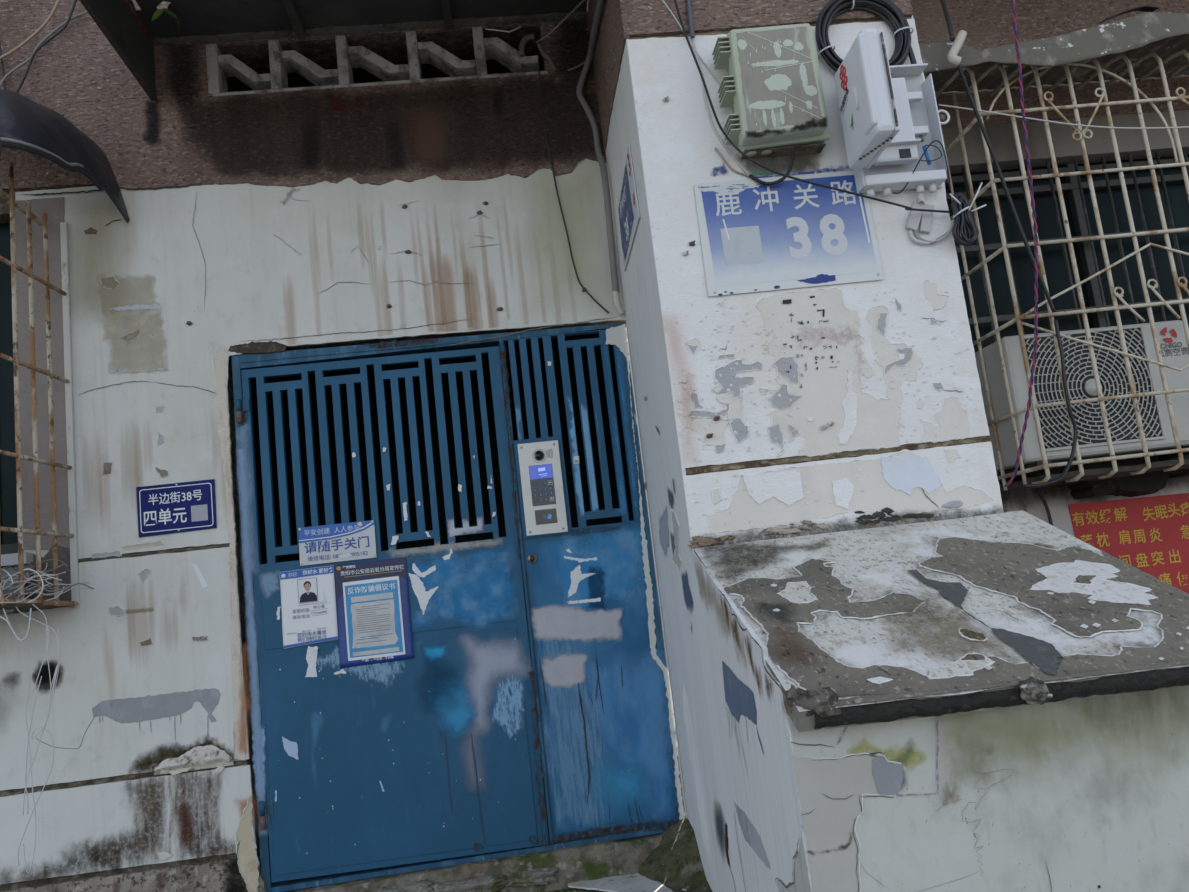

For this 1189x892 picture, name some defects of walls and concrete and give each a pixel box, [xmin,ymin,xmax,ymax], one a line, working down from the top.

crack [22,184,206,306]
peeling [671,279,994,571]
peeling [724,537,1189,718]
water stain [4,739,247,892]
spalling [235,719,265,892]
crack [775,794,894,892]
crack [791,742,893,764]